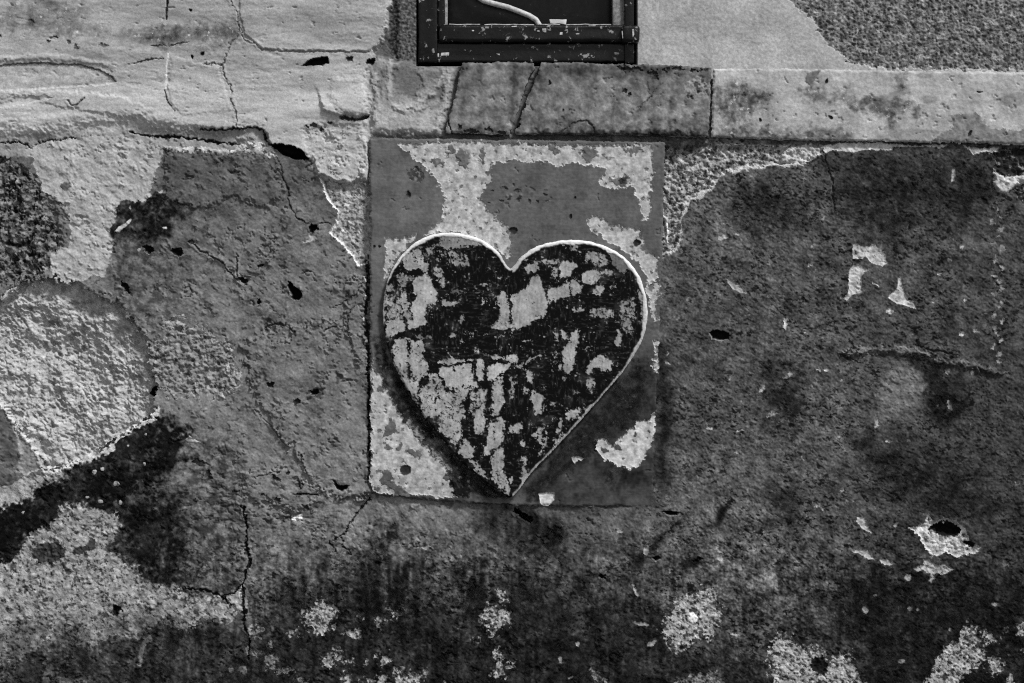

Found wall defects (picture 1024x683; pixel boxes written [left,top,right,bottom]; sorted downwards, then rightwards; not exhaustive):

crack [6,137,75,148]
crack [0,0,187,82]
crack [131,0,368,225]
flaking render [790,0,1024,73]
peeling [303,123,947,322]
leakage [0,410,193,591]
flaking render [0,134,276,514]
crack [184,505,252,660]
peeling [369,363,458,499]
leakage [195,336,738,683]
leakage [760,353,804,424]
leakage [835,566,1024,683]